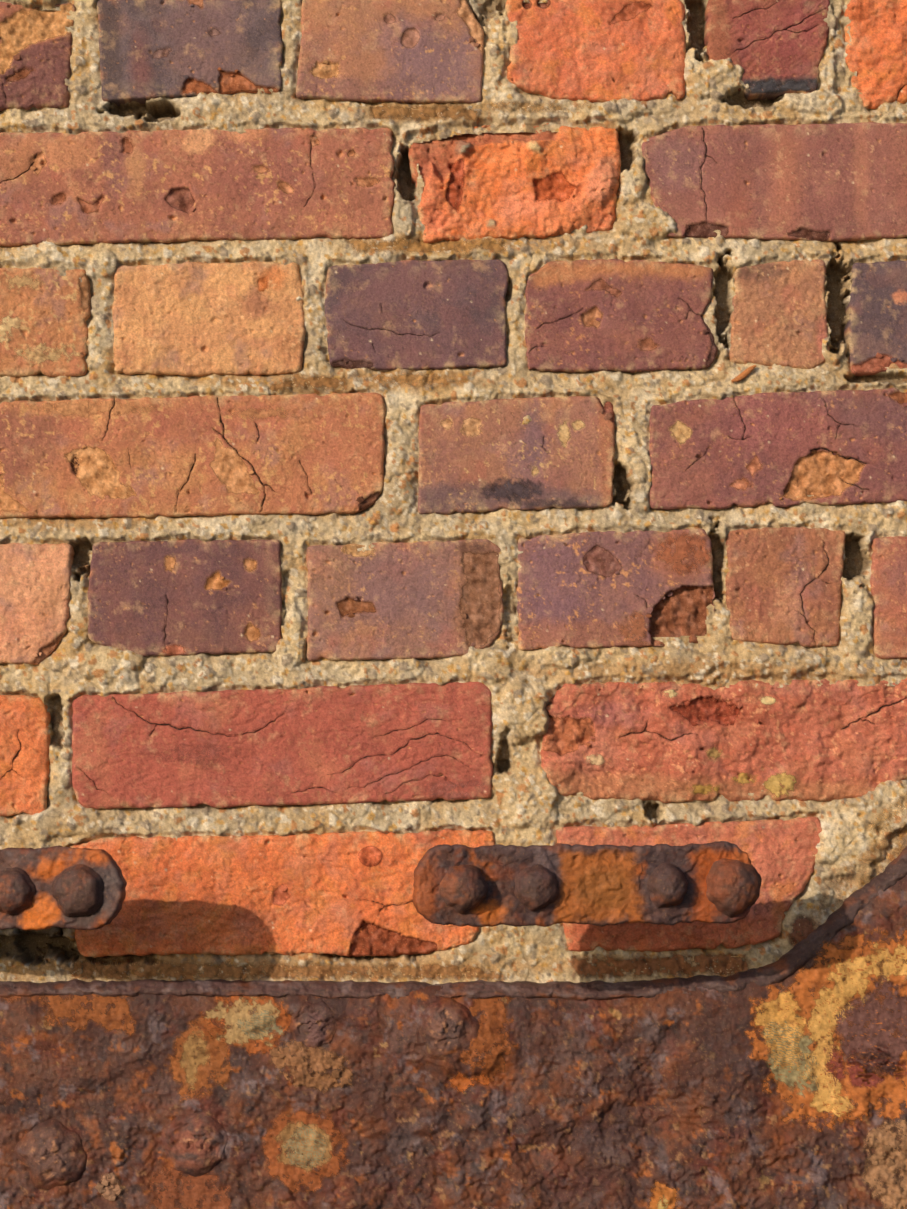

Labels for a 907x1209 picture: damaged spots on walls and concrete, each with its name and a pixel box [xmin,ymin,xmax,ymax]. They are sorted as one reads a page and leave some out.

crack [215,398,277,514]
spalling [779,451,864,501]
spalling [646,586,713,645]
crack [114,699,279,737]
crack [294,719,475,795]
crack [618,719,693,741]
crack [842,697,907,729]
corrosion [3,994,135,1036]
corrosion [71,958,504,1102]
corrosion [449,996,519,1092]
corrosion [744,916,907,1209]
corrosion [262,1110,349,1192]